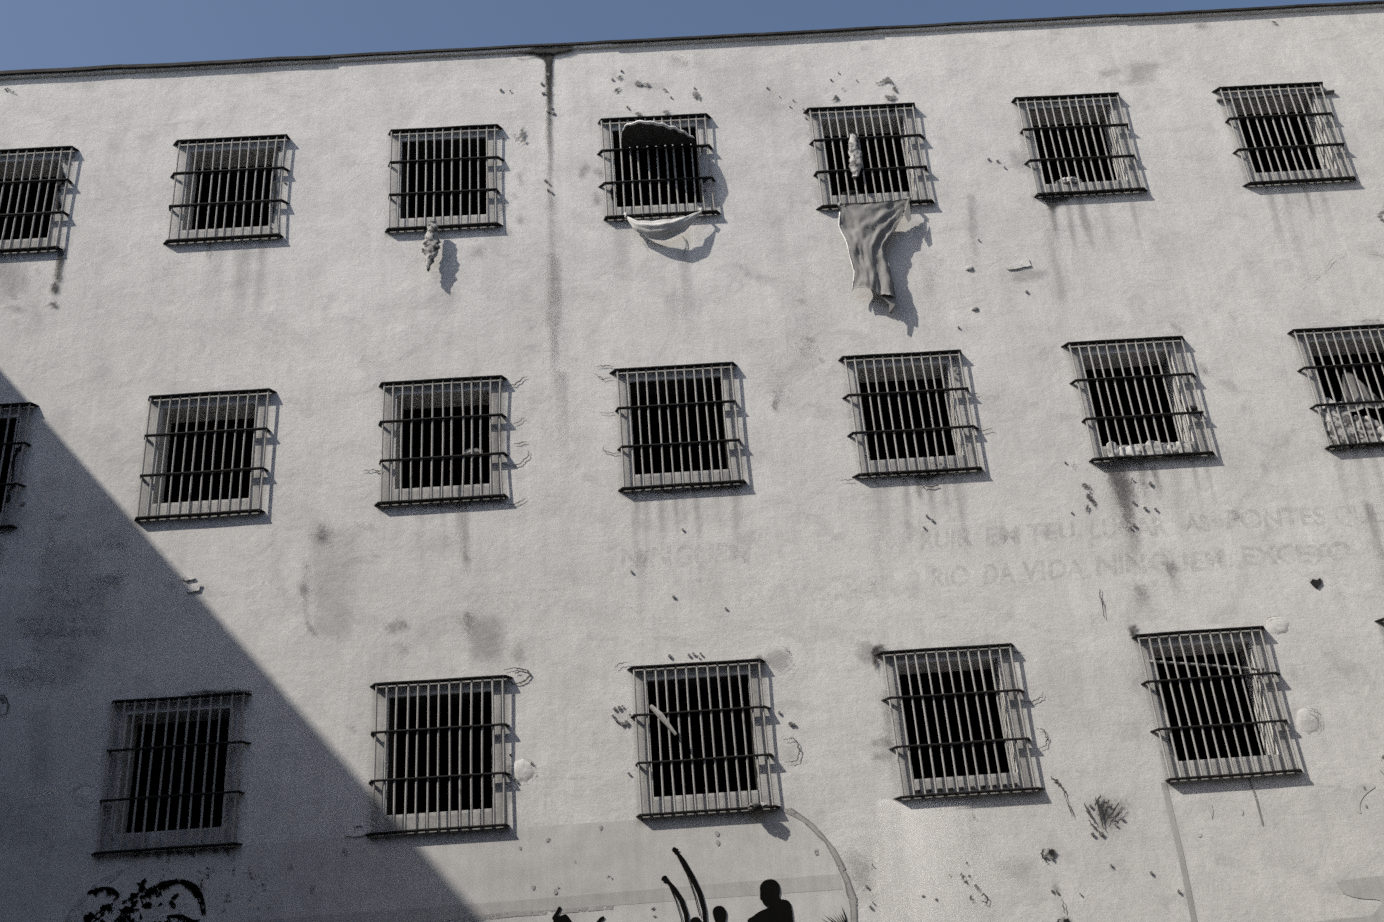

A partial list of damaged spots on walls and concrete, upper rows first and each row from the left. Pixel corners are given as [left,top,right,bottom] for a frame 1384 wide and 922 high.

leakage [513,46,573,126]